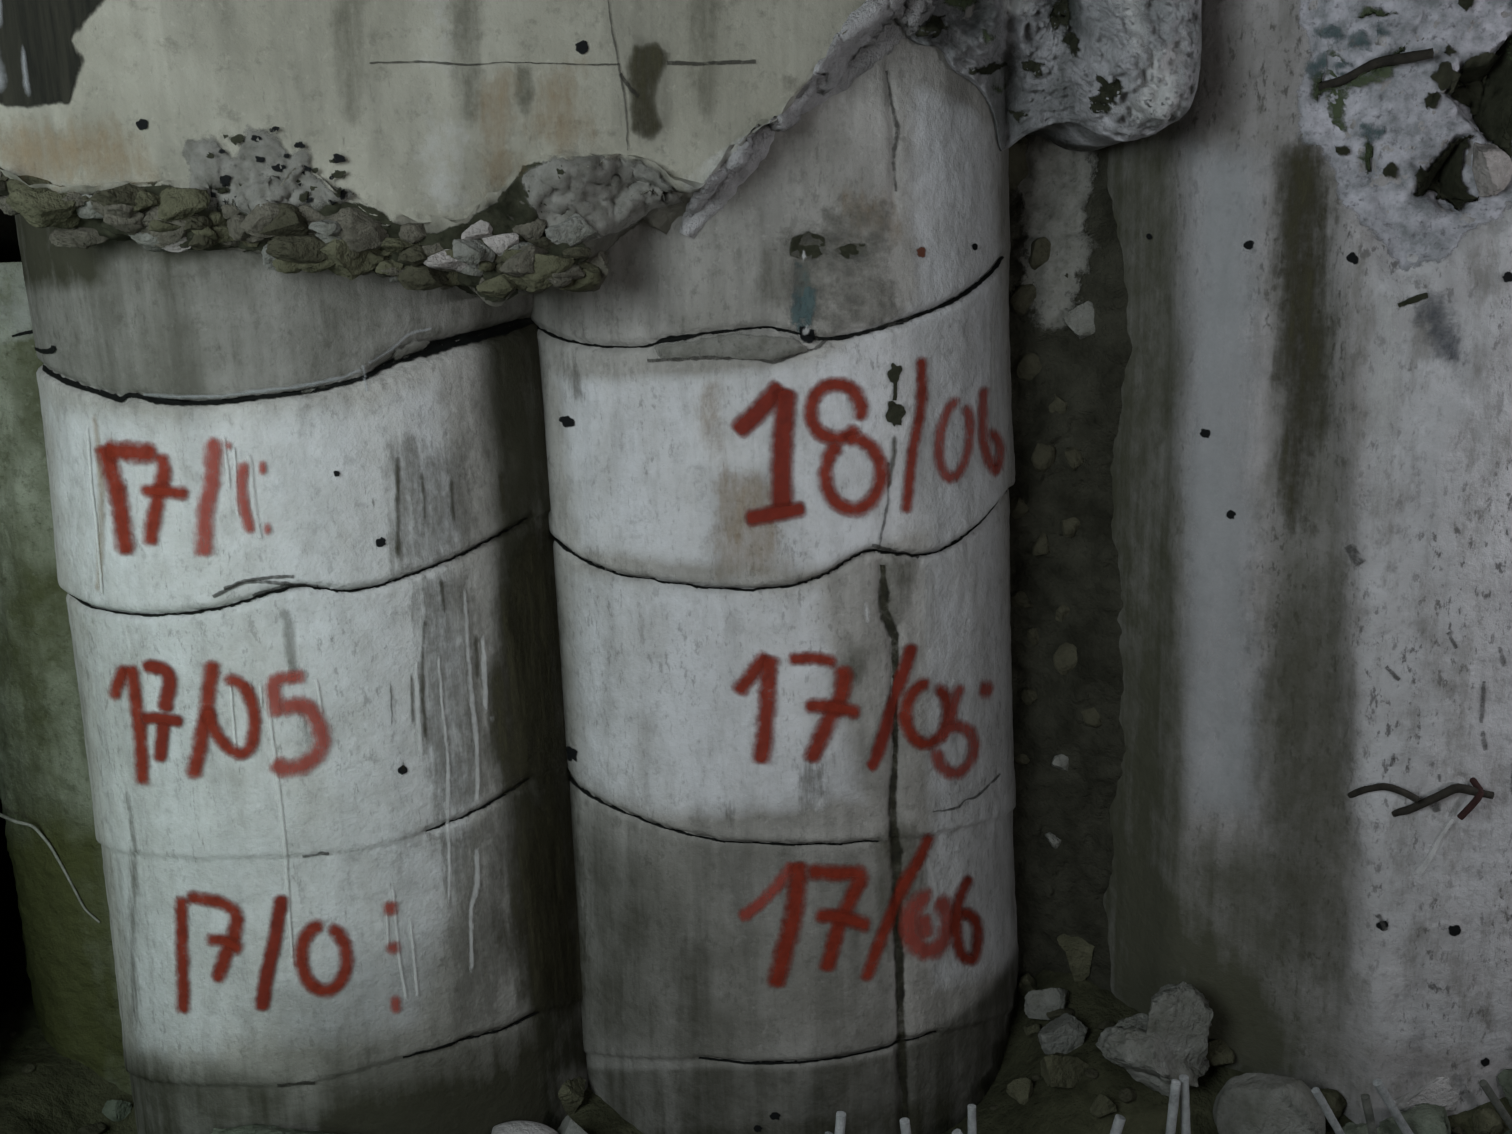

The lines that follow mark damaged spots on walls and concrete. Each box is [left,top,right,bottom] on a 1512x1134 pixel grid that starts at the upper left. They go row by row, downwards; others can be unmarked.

spalling [0,126,610,302]
crack [12,256,1004,406]
spalling [789,213,896,343]
crack [886,70,899,191]
water stain [1277,145,1326,529]
spalling [1297,0,1512,271]
crack [68,462,1007,1118]